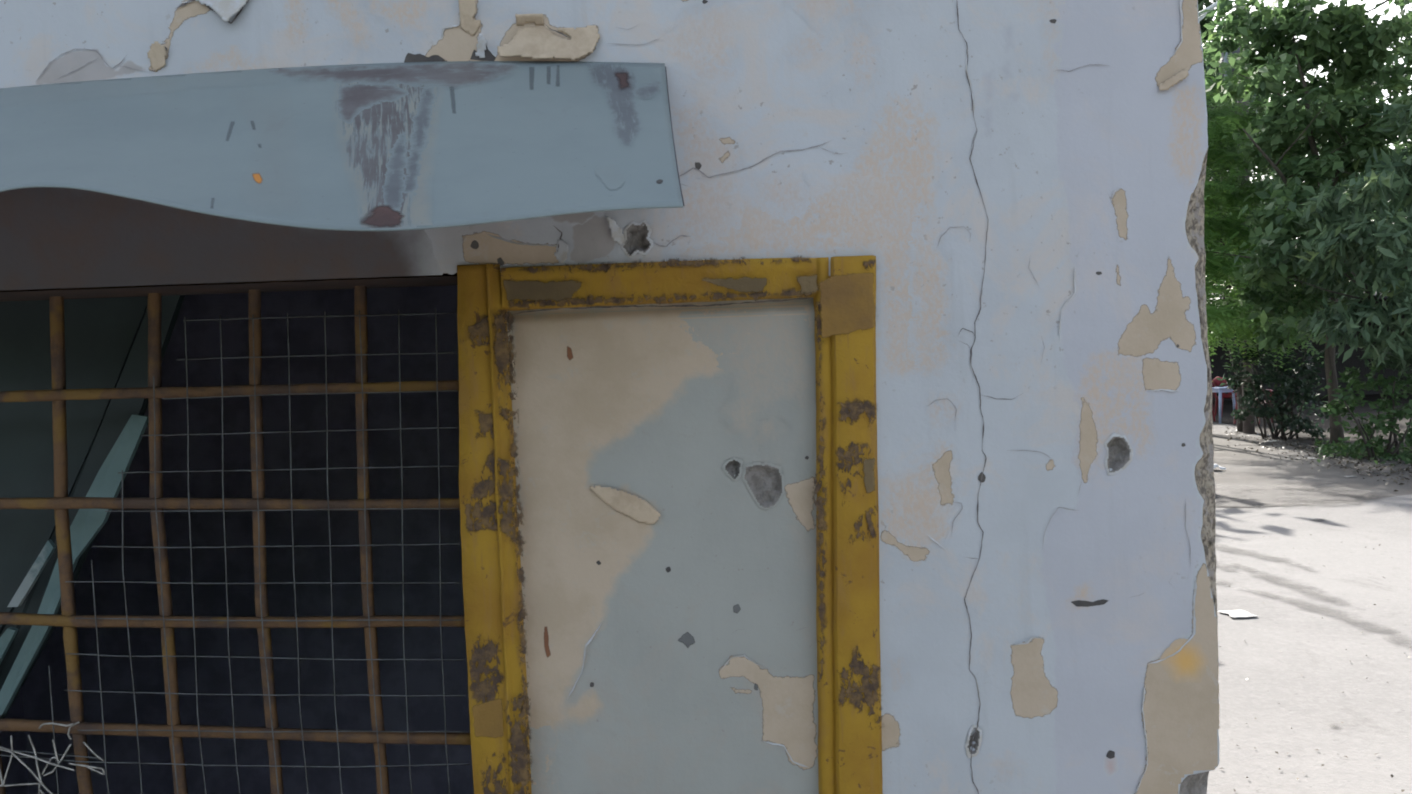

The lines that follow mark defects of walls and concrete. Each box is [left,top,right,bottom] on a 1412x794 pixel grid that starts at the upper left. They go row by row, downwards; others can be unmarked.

peeling [425,0,600,62]
peeling [1037,0,1066,88]
rust [0,62,519,291]
crack [680,140,845,186]
crack [926,3,1049,794]
peeling [1078,398,1133,483]
peeling [1118,0,1220,794]
peeling [507,298,818,794]
peeling [878,437,958,567]
spalling [1071,599,1108,607]
peeling [1010,637,1058,718]
peeling [881,714,901,751]